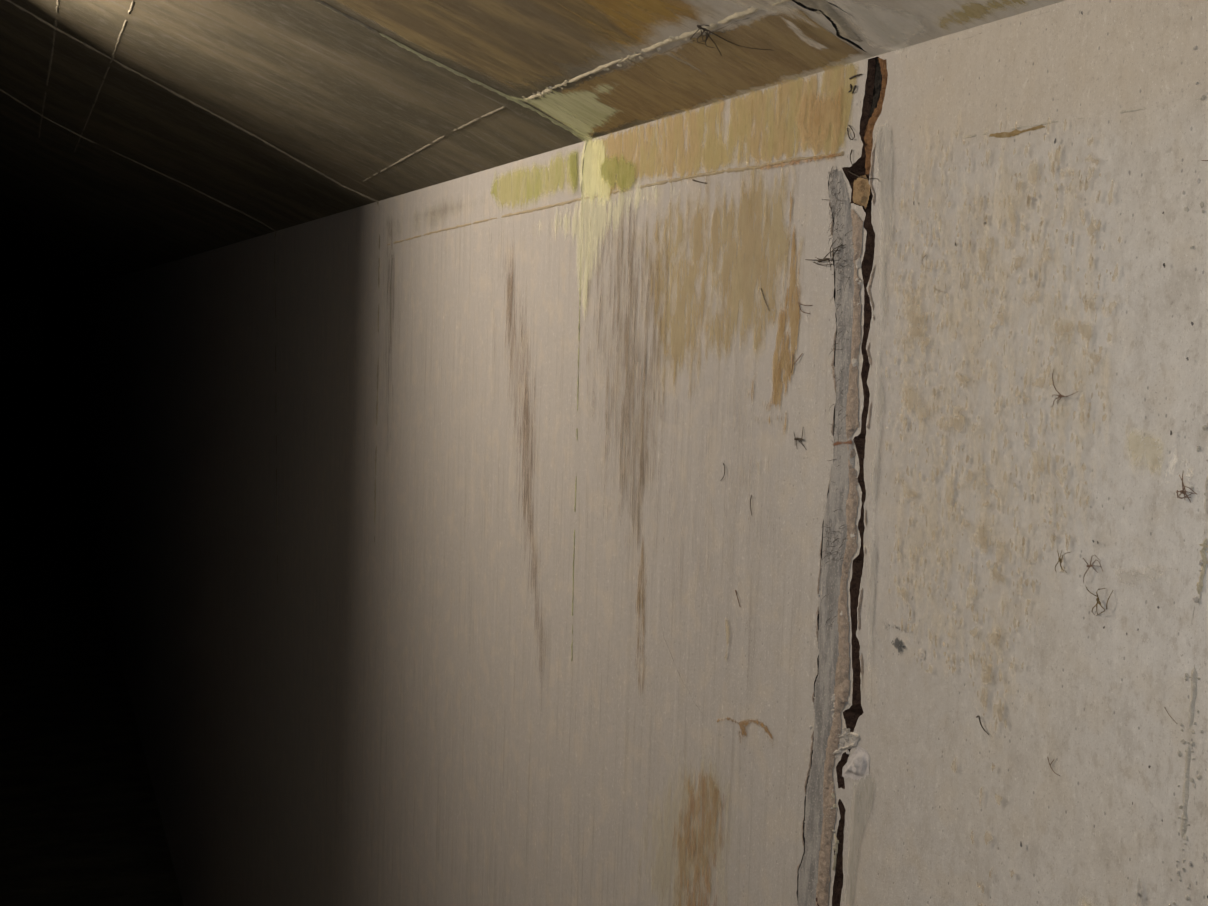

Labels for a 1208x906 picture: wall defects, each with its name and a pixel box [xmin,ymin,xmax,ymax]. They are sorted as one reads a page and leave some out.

leakage [336,0,687,310]
leakage [647,171,788,381]
spalling [796,169,863,906]
crack [792,0,888,906]